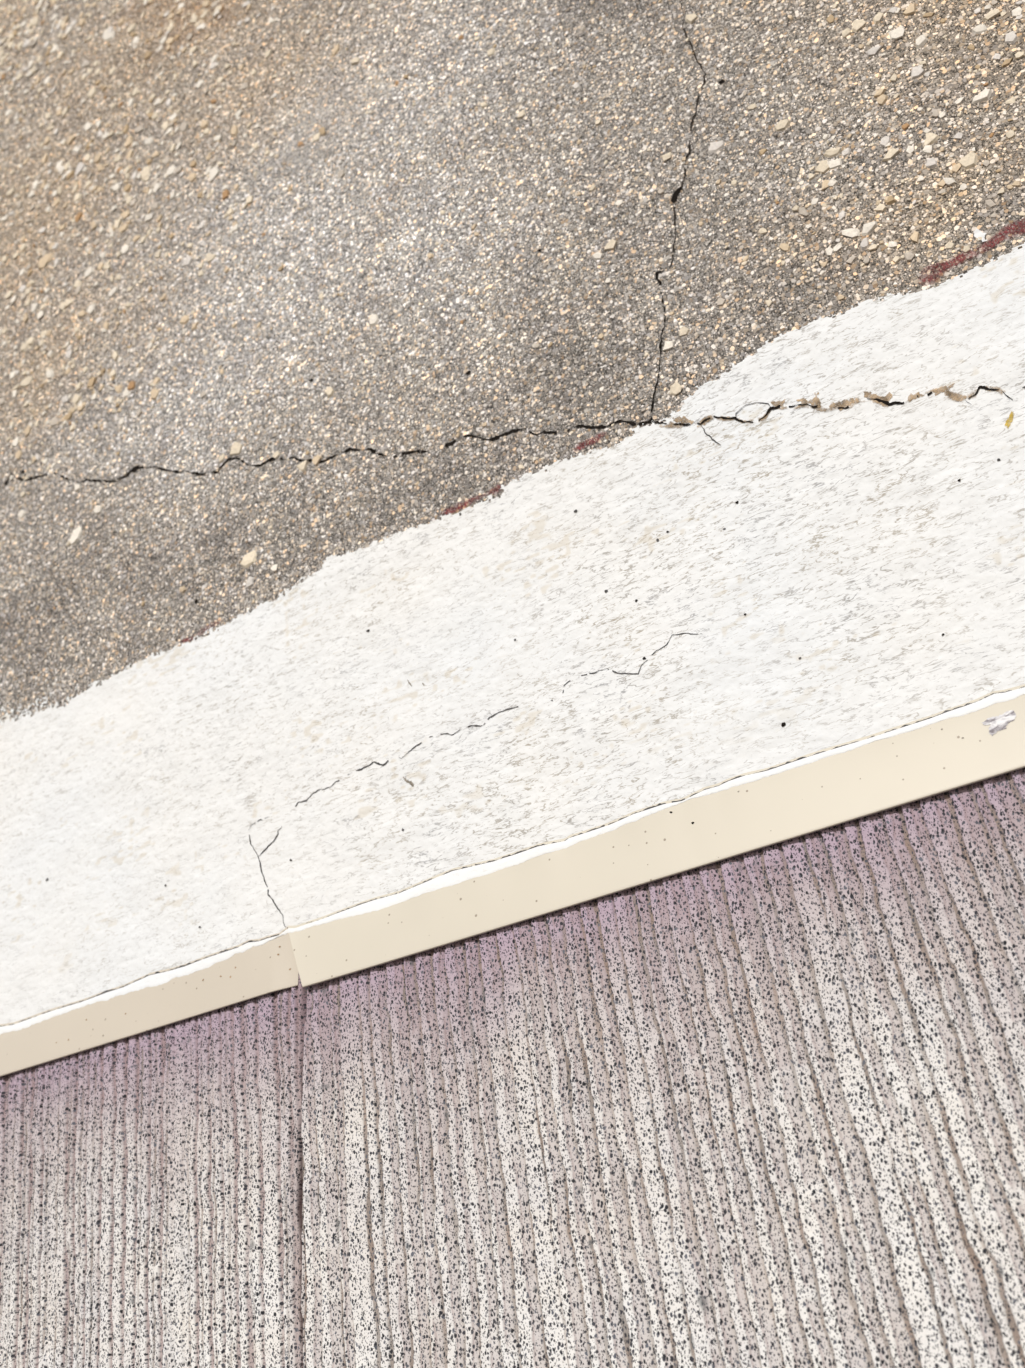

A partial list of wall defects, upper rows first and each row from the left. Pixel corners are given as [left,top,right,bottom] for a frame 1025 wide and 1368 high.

crack [4,3,1025,485]
crack [551,633,702,701]
crack [0,686,1025,1027]